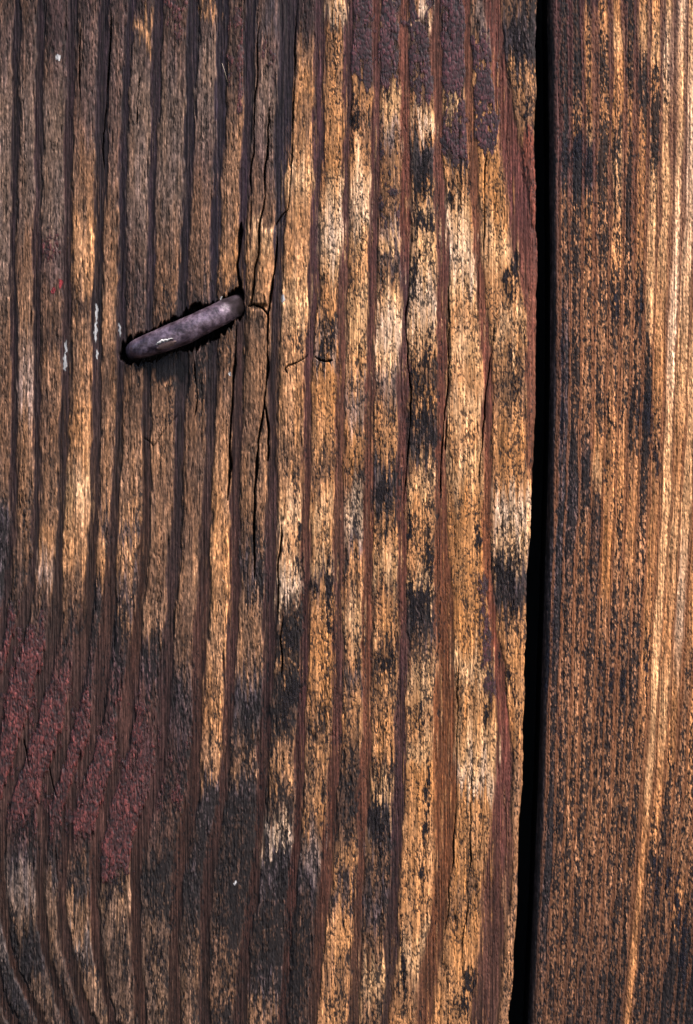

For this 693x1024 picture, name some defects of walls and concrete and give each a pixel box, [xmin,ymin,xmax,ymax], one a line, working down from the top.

peeling [351,0,501,169]
crack [227,29,332,673]
peeling [0,600,188,884]